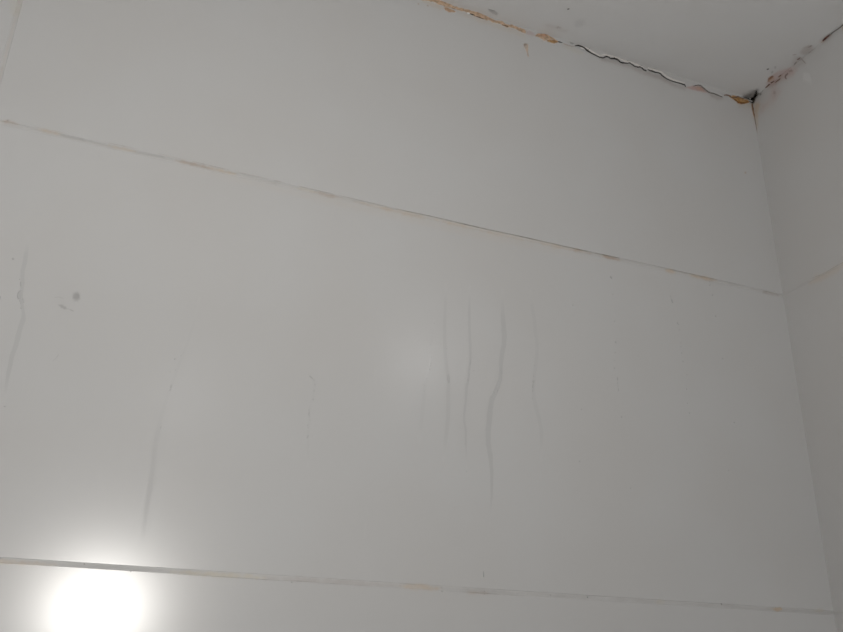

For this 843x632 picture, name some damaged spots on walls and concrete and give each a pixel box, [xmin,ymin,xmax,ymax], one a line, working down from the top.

crack [575,44,731,97]